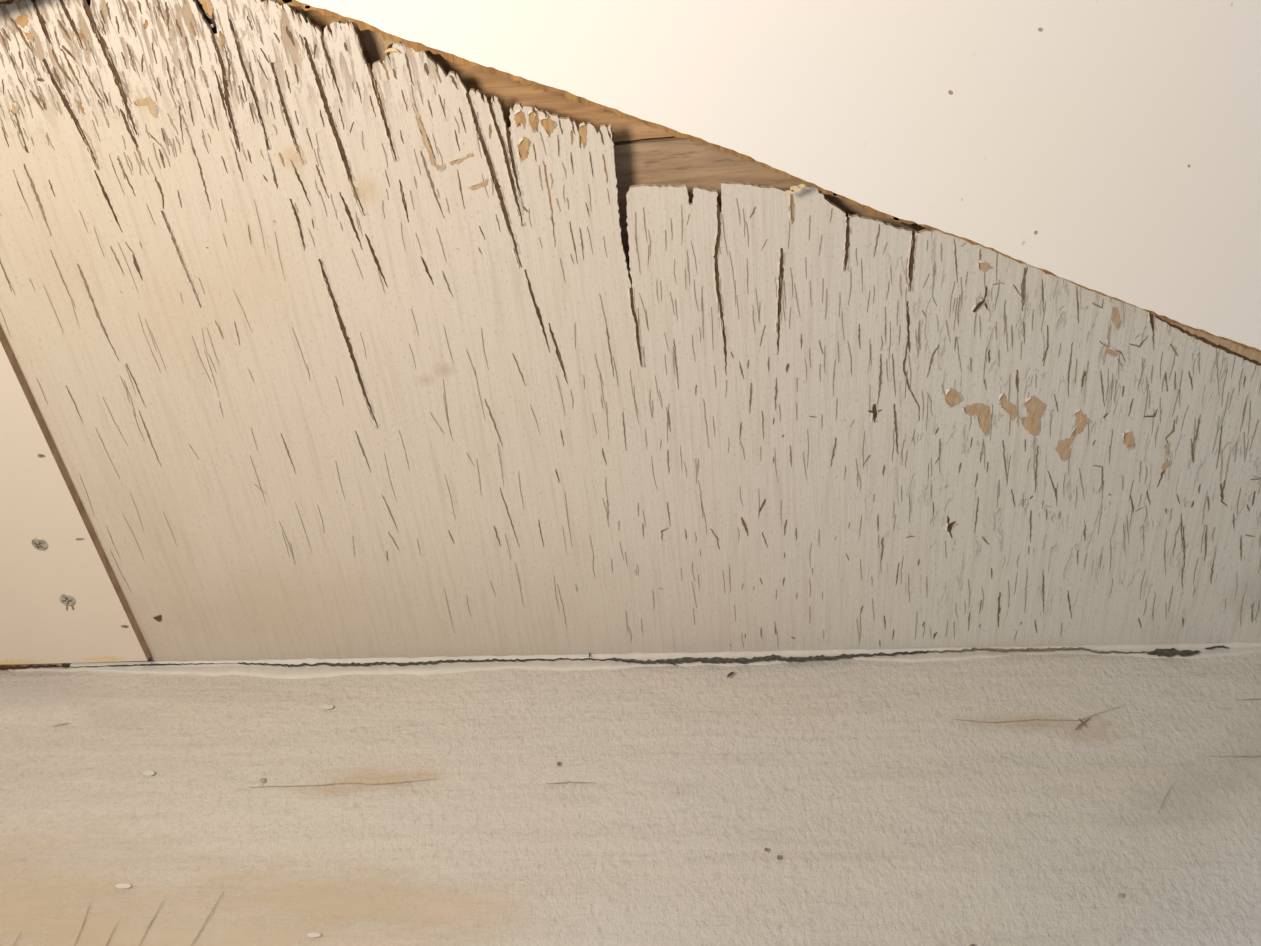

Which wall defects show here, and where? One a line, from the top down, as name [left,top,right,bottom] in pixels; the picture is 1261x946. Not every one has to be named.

peeling [198,0,214,19]
peeling [132,97,159,118]
peeling [417,117,474,172]
peeling [514,109,558,162]
peeling [579,123,587,148]
peeling [783,184,806,195]
peeling [976,260,992,272]
peeling [1111,307,1121,330]
crack [0,0,1261,677]
peeling [1152,315,1261,366]
peeling [945,388,1047,436]